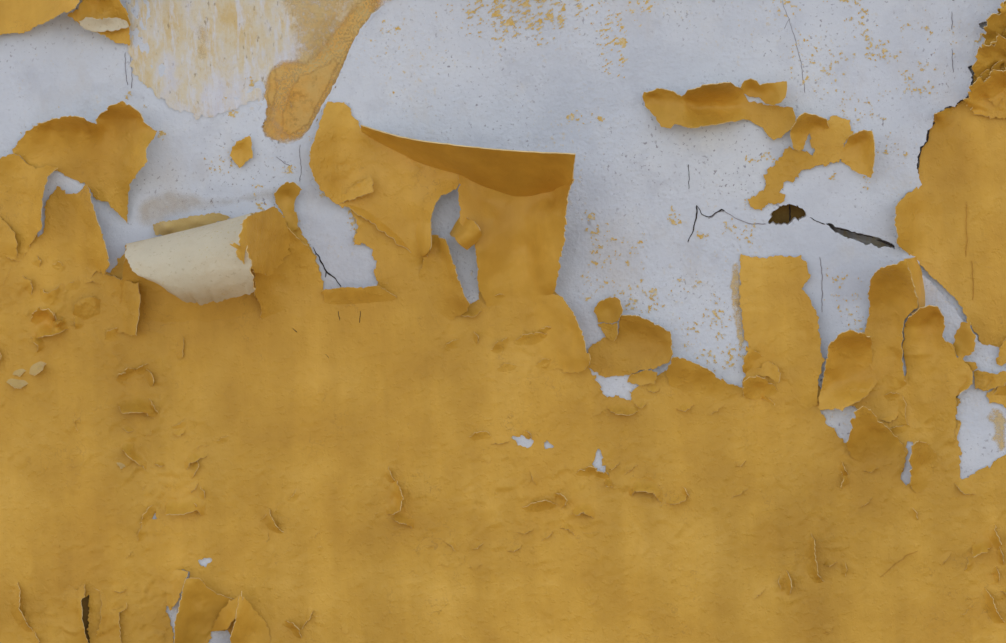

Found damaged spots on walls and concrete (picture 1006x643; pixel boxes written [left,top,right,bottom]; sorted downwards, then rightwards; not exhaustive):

peeling [0,0,1006,443]
crack [688,164,765,241]
crack [810,217,894,247]
peeling [955,333,1006,479]
peeling [511,433,554,449]
peeling [592,449,608,474]
peeling [901,441,913,485]
peeling [81,596,90,643]
peeling [166,592,183,638]
peeling [208,630,231,643]